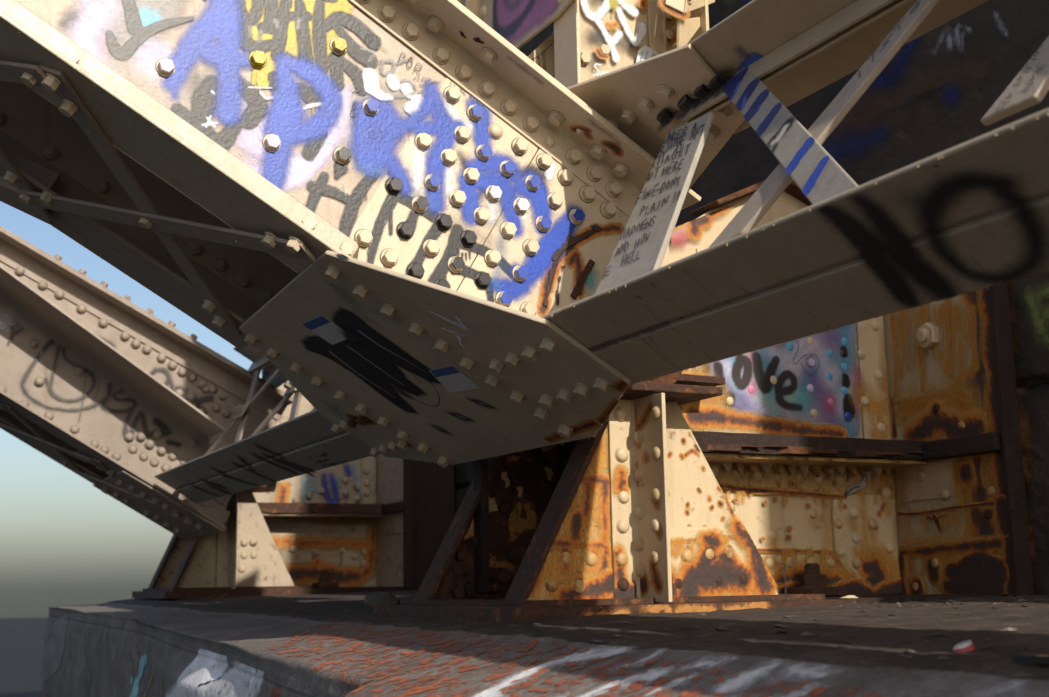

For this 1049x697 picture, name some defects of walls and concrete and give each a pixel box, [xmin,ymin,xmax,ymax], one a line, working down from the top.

corrosion [682,368,707,376]
corrosion [859,288,1000,441]
corrosion [276,482,291,503]
corrosion [529,379,1014,616]
corrosion [272,518,378,587]